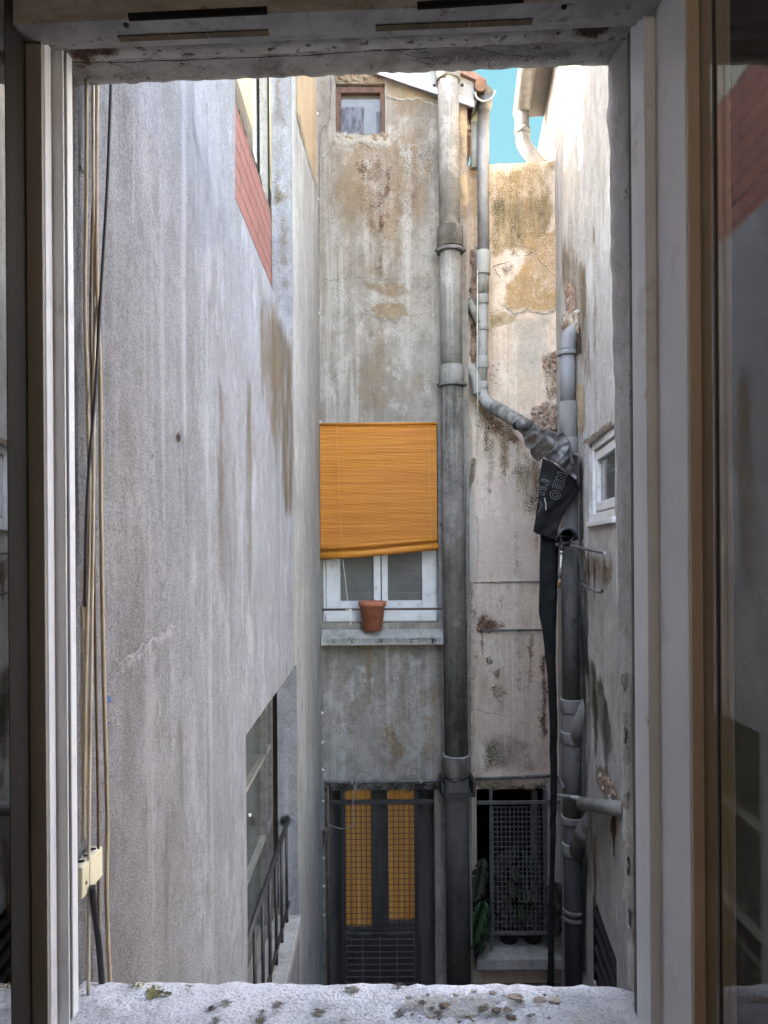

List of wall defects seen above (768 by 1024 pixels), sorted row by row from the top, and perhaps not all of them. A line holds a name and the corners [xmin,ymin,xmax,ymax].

water stain [325,96,439,411]
water stain [489,185,529,239]
peeling [459,108,582,357]
water stain [139,80,211,941]
water stain [208,281,295,676]
flaking render [469,318,477,364]
water stain [470,399,542,516]
spalling [541,351,557,401]
water stain [578,460,614,797]
water stain [482,732,540,773]
water stain [581,810,612,980]